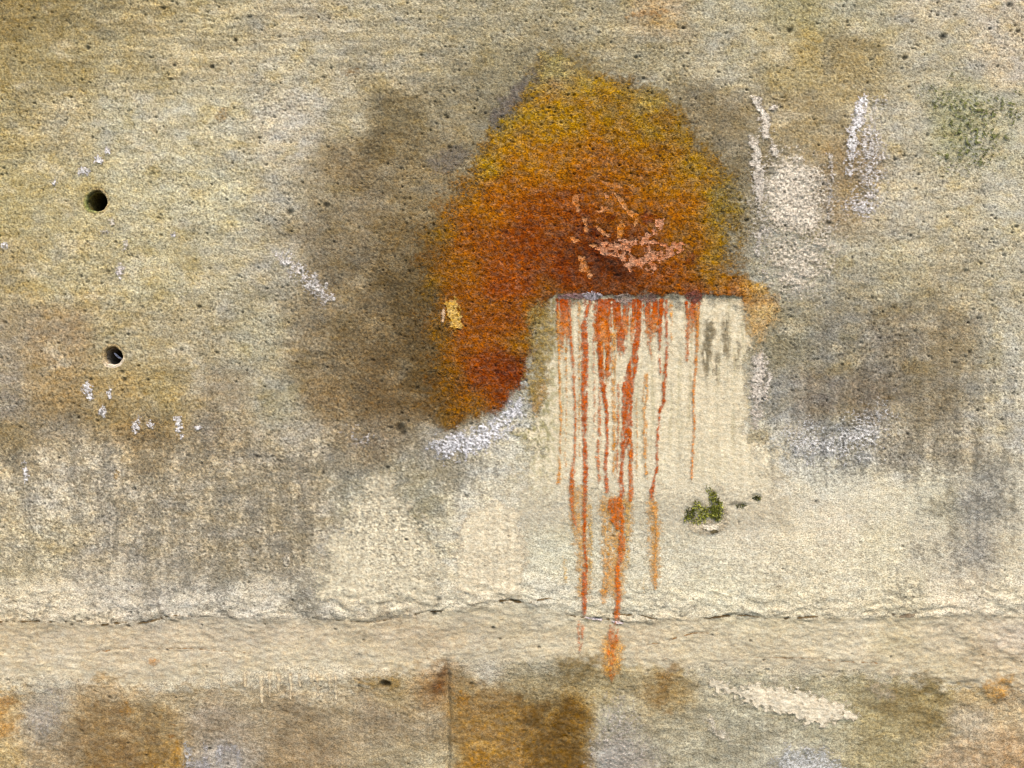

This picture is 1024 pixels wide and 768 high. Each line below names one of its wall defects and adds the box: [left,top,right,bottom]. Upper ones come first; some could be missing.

water stain [0,58,992,618]
rust [415,47,779,677]
water stain [935,455,1012,574]